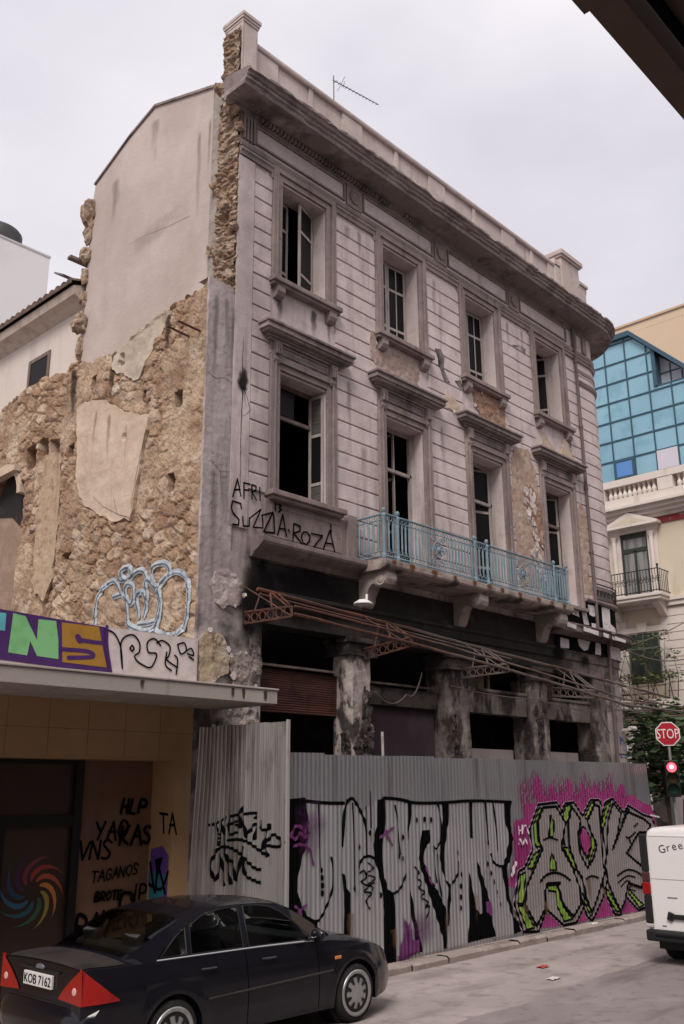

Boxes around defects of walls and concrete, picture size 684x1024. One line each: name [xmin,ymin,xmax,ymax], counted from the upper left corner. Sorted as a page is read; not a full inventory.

flaking render [206,25,245,292]
spalling [70,198,96,361]
spalling [369,329,420,386]
spalling [435,347,509,427]
peeling [510,447,546,588]
spalling [209,568,247,609]
spalling [198,627,262,687]